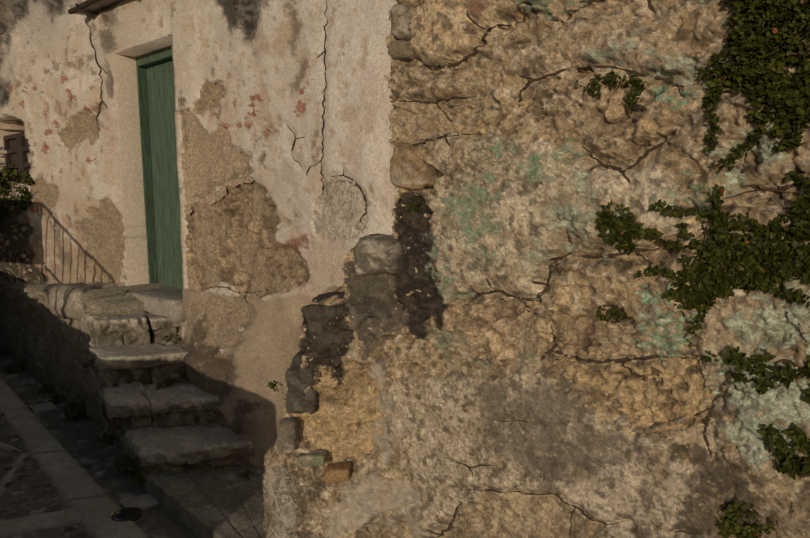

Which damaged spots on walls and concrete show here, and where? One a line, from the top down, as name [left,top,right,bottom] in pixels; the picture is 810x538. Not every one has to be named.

damp [0,0,65,45]
damp [100,6,116,52]
damp [216,0,261,40]
damp [0,79,9,105]
flaking render [41,106,101,153]
crack [85,22,108,127]
crack [287,0,367,222]
flaking render [86,198,126,287]
flaking render [179,80,310,357]
flaking render [313,176,369,243]
crack [429,459,623,538]